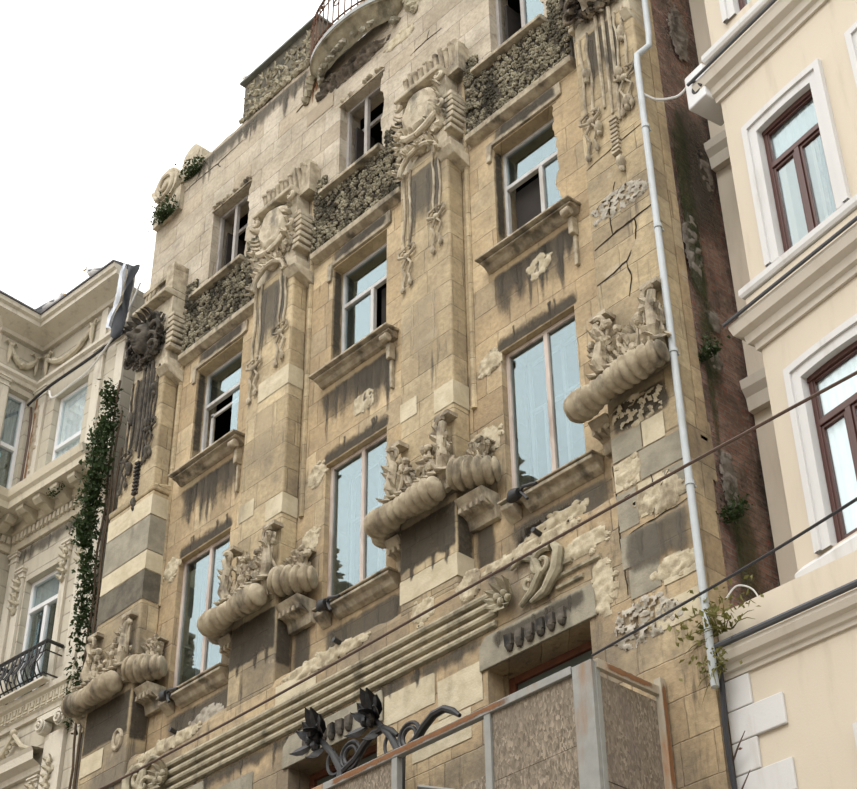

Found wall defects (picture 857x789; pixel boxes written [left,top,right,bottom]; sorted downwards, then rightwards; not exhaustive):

spalling [315,22,414,102]
leakage [672,107,721,247]
leakage [495,228,573,309]
crack [595,182,651,296]
leakage [323,351,397,465]
spalling [605,384,667,430]
leakage [180,459,237,558]
spalling [454,498,695,652]
spalling [281,631,371,682]